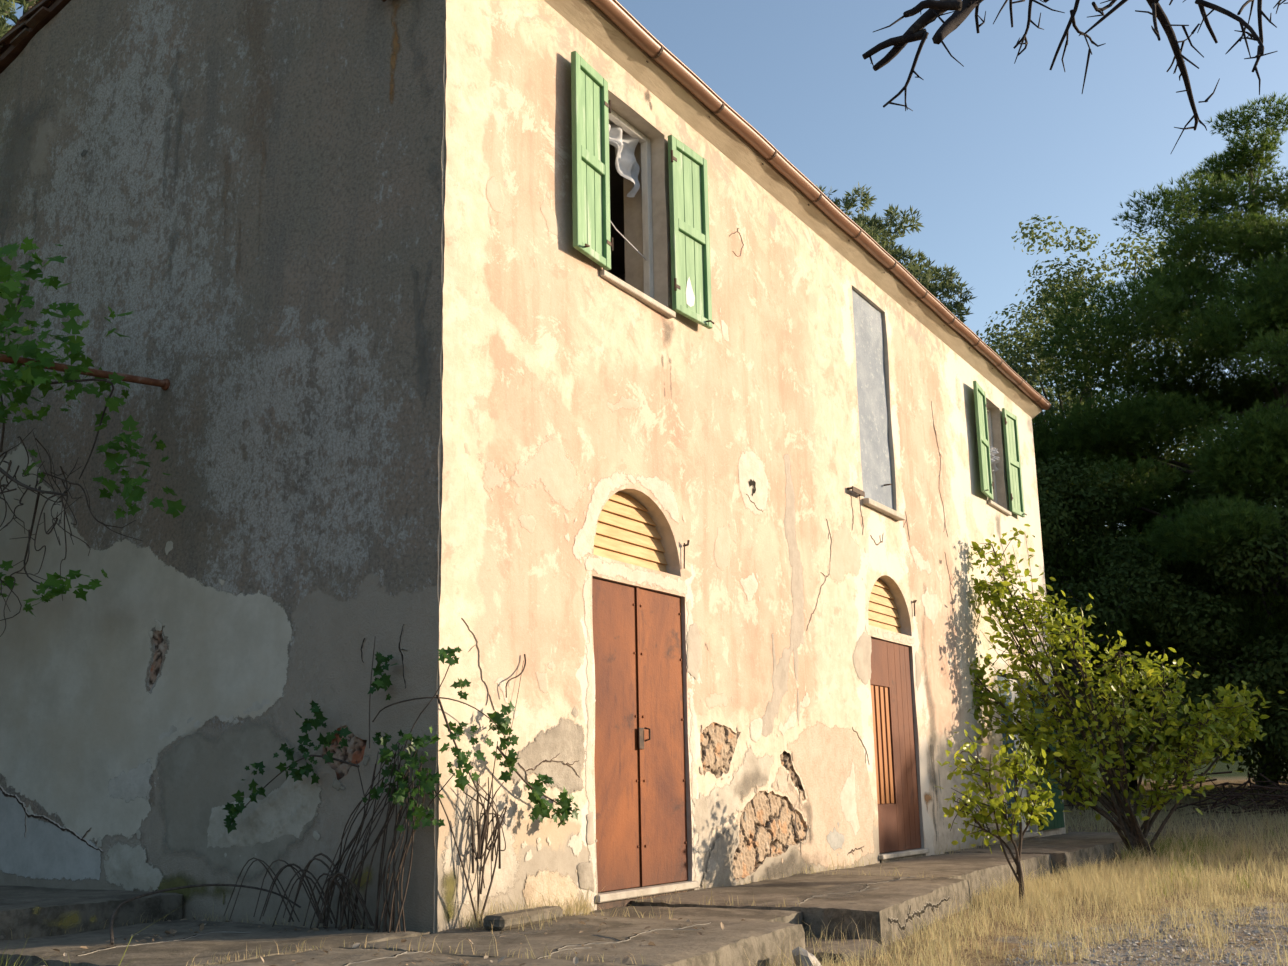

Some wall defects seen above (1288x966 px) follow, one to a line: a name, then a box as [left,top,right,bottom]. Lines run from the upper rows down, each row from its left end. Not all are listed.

flaking render [148,620,168,691]
crack [0,785,103,852]
peeling [107,758,159,802]
flaking render [321,725,374,790]
flaking render [700,692,874,882]
crack [797,877,951,932]